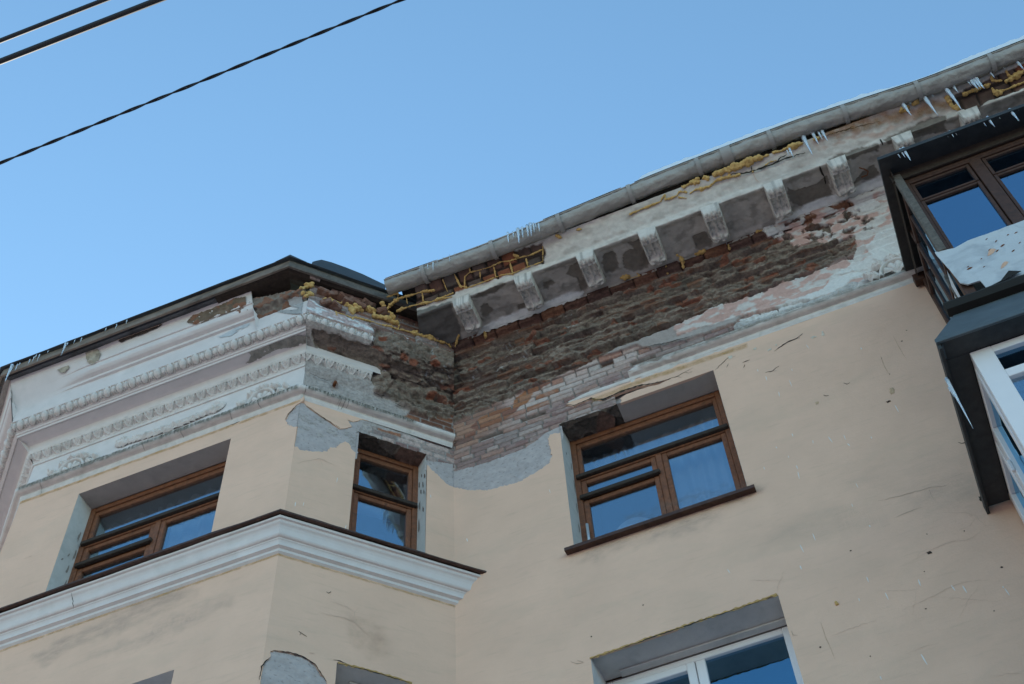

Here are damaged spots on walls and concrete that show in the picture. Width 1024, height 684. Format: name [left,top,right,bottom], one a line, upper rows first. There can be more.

spalling [187,186,904,532]
peeling [261,651,327,684]